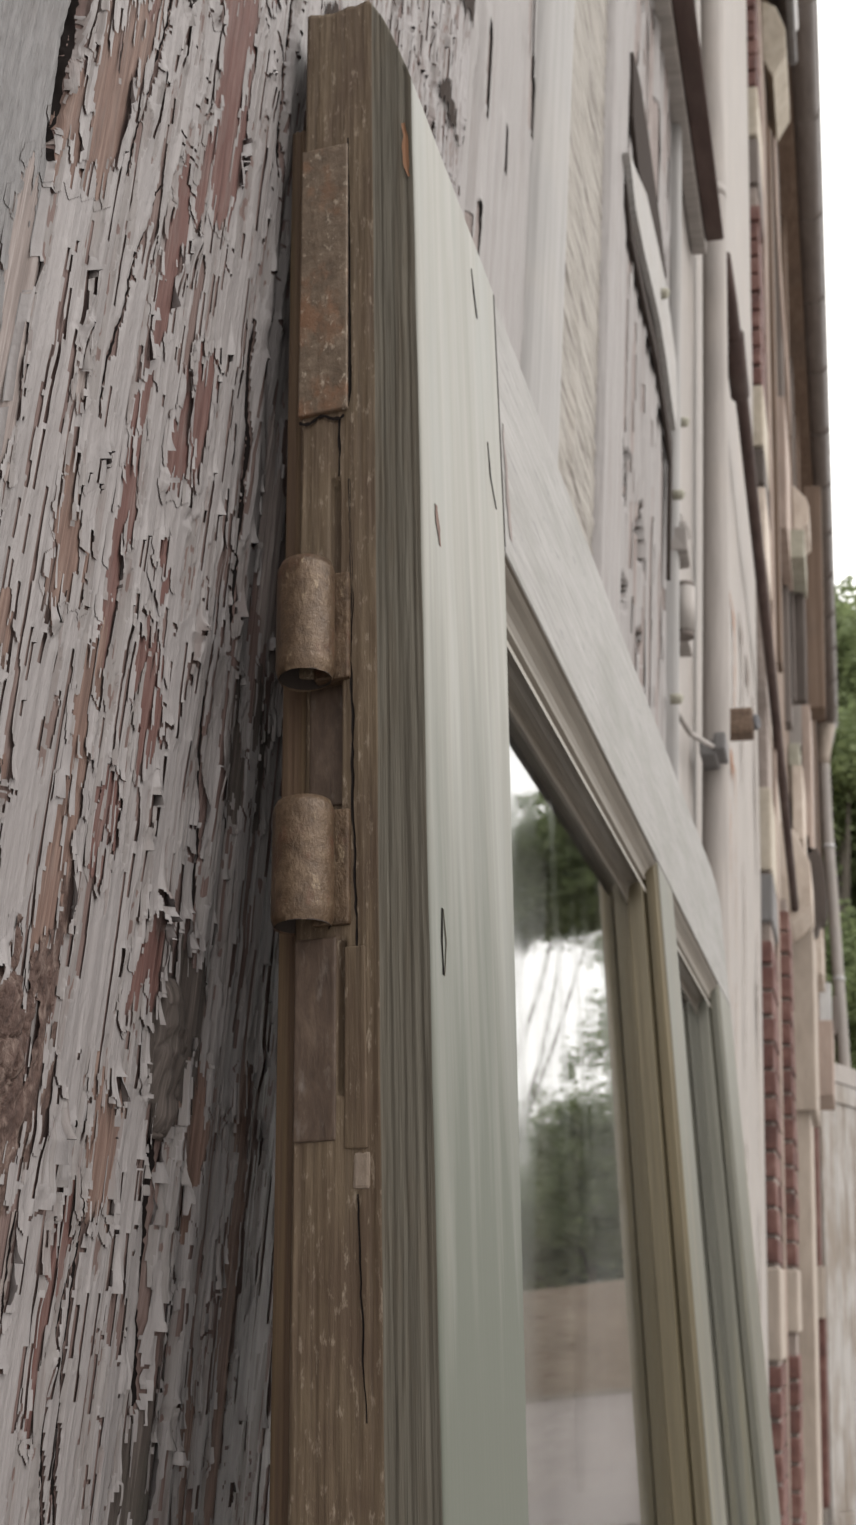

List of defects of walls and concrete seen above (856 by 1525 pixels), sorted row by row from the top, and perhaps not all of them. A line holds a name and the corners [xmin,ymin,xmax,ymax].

peeling [0,0,287,1525]